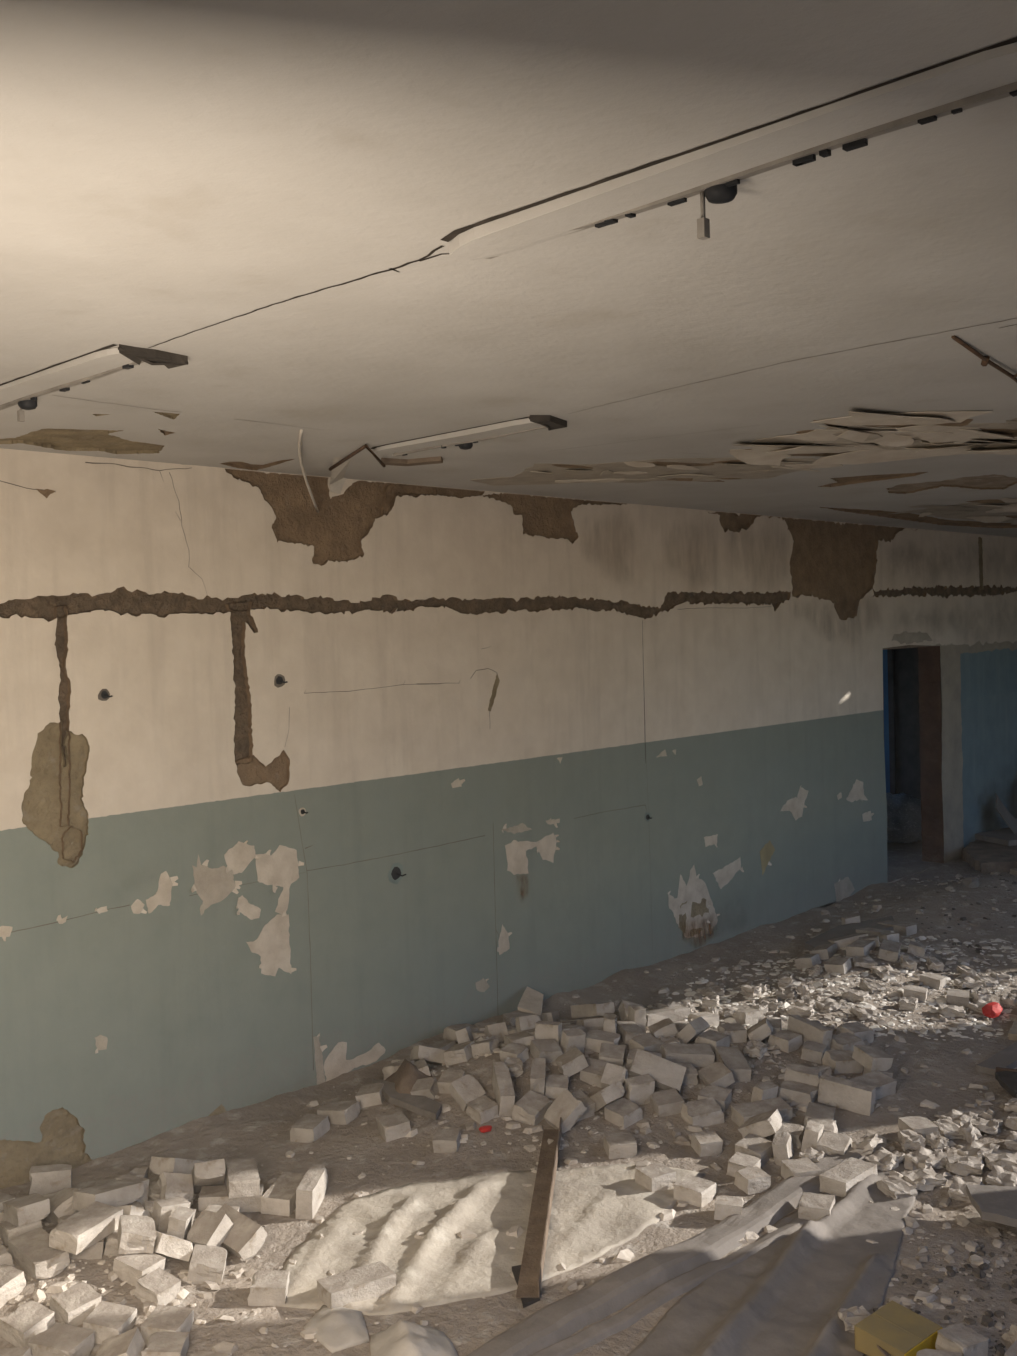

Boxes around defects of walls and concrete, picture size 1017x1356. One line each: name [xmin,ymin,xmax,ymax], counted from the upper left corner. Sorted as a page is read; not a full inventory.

crack [149,246,449,348]
spalling [0,412,179,454]
spalling [221,411,1017,620]
spalling [21,720,90,868]
peeling [502,818,560,875]
peeling [131,841,304,976]
peeling [667,858,744,938]
spalling [0,1107,92,1189]